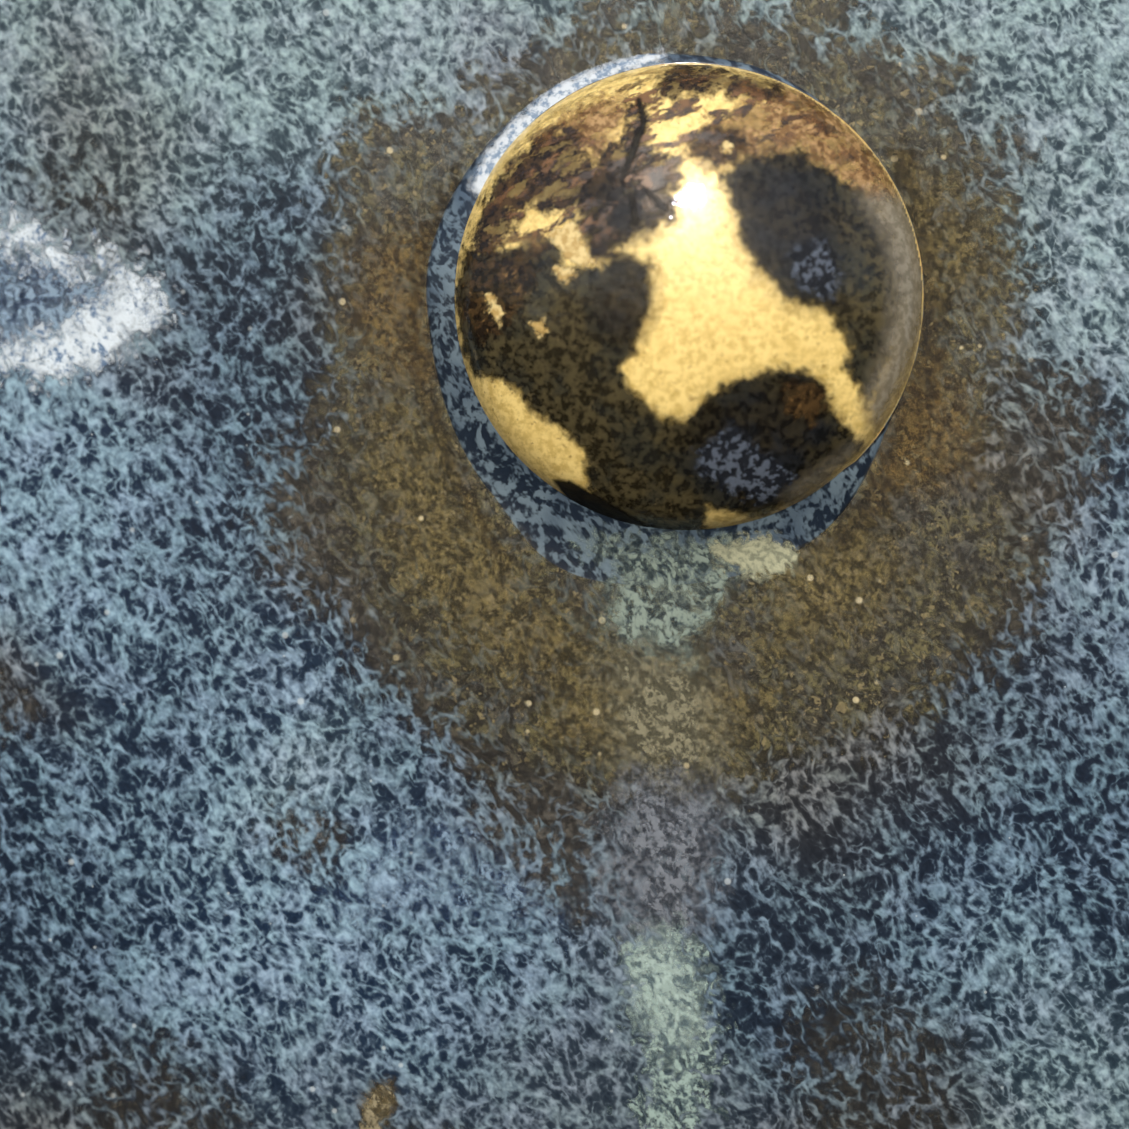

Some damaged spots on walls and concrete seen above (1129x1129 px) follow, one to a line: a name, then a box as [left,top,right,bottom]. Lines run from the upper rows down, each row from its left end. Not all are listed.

leakage [0,201,167,325]
rust [264,0,1104,925]
leakage [594,532,798,1129]